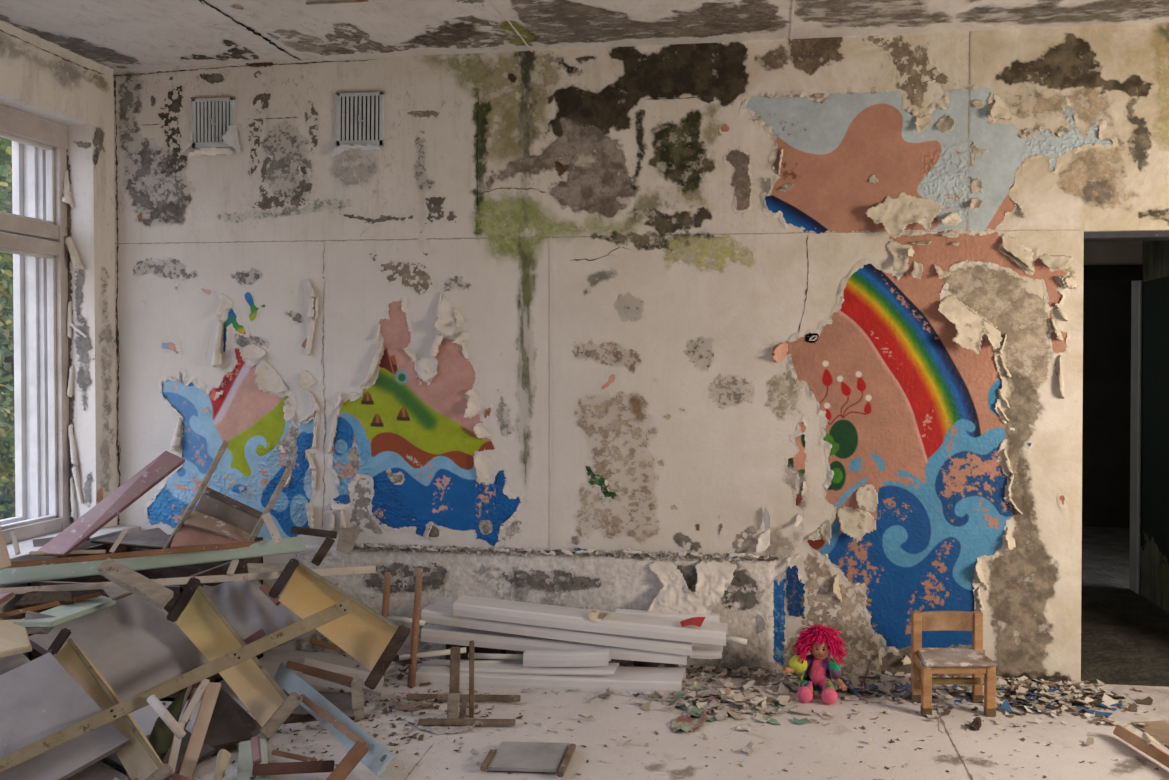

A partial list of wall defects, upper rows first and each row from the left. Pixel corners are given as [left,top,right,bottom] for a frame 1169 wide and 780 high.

damp [486,0,1169,251]
crack [0,0,376,526]
damp [496,397,530,475]
damp [517,242,532,412]
peeling [143,34,1120,675]